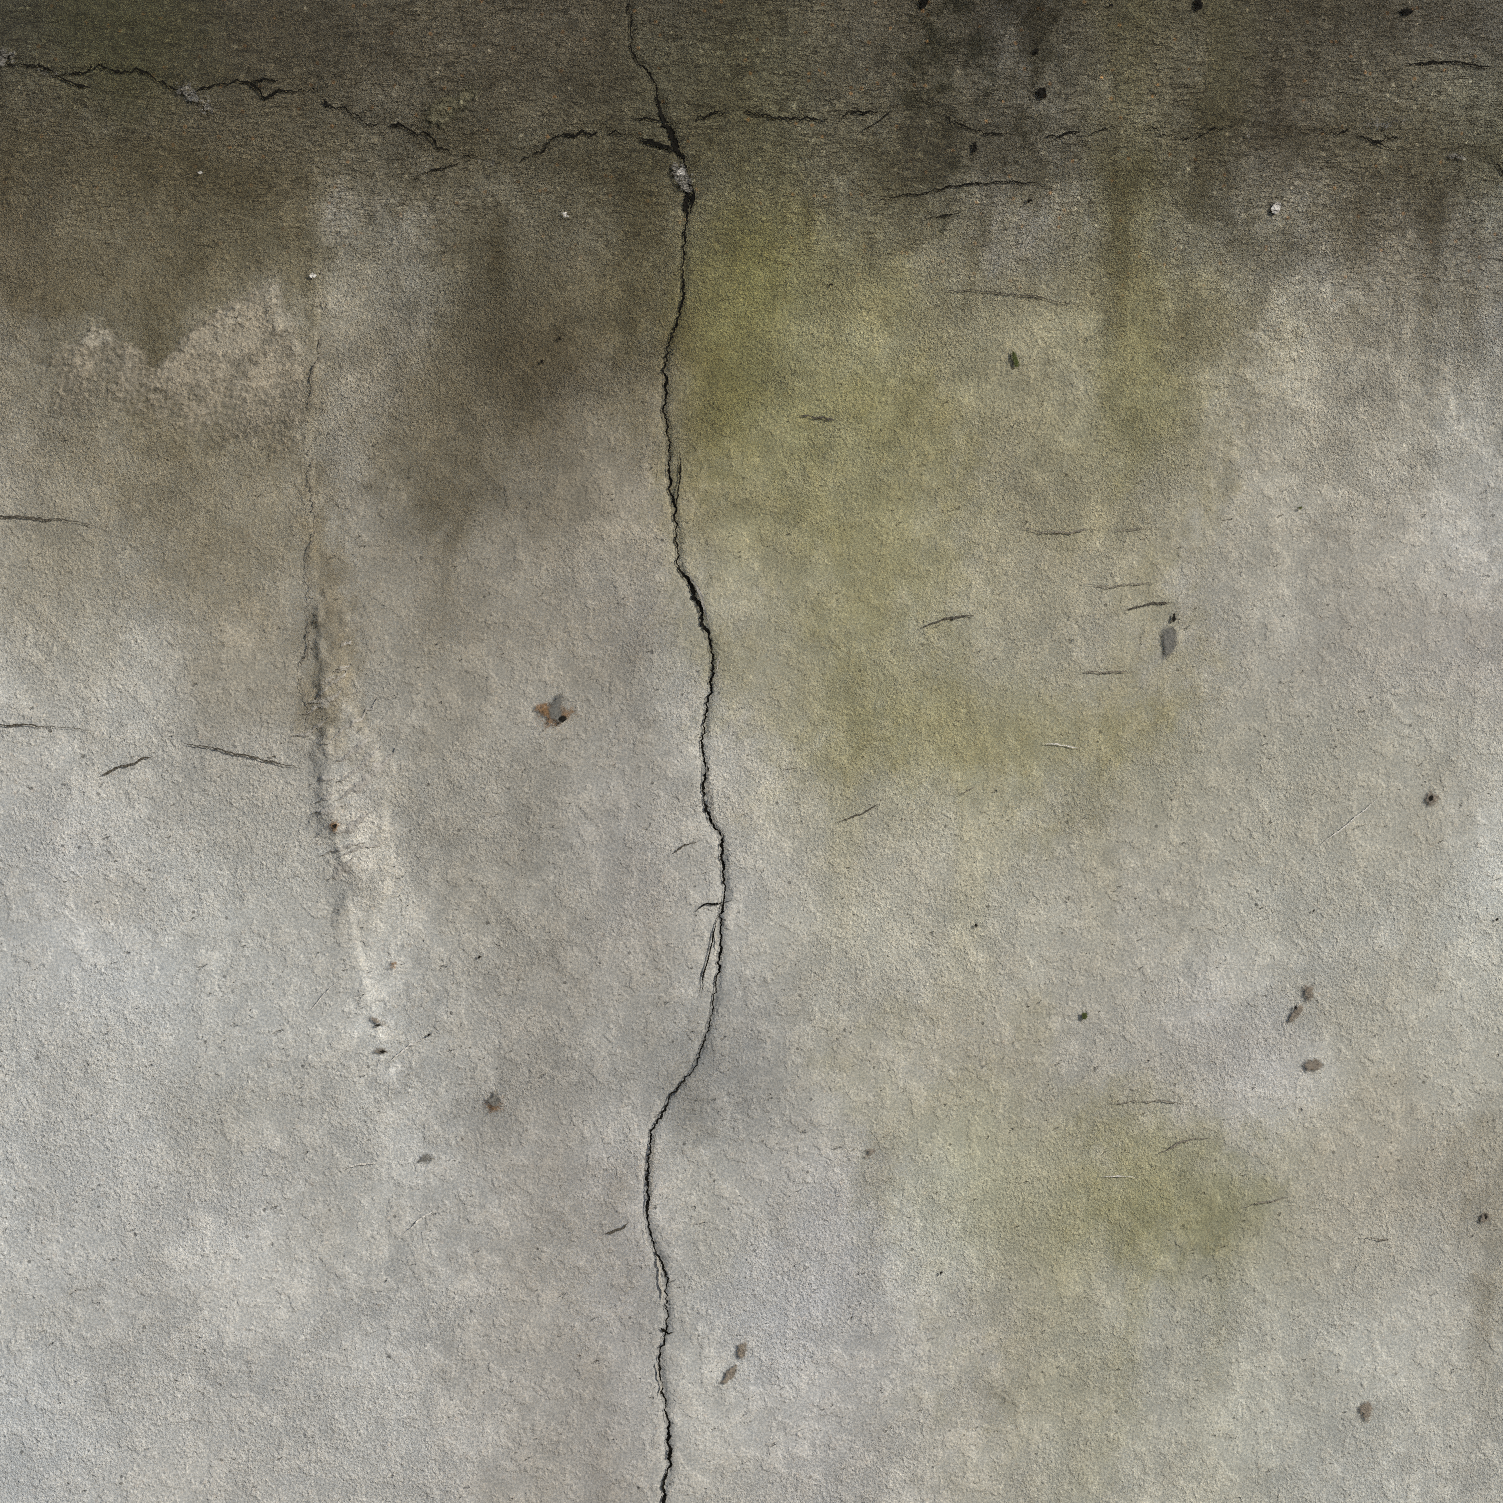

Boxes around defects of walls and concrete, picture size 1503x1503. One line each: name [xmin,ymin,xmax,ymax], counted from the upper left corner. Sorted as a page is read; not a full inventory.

water stain [0,47,15,66]
water stain [177,82,218,114]
crack [5,62,472,182]
crack [944,114,1008,135]
crack [1046,127,1111,138]
crack [1147,123,1237,140]
crack [1302,129,1399,152]
crack [880,180,1055,220]
crack [0,723,94,732]
crack [520,0,892,1503]